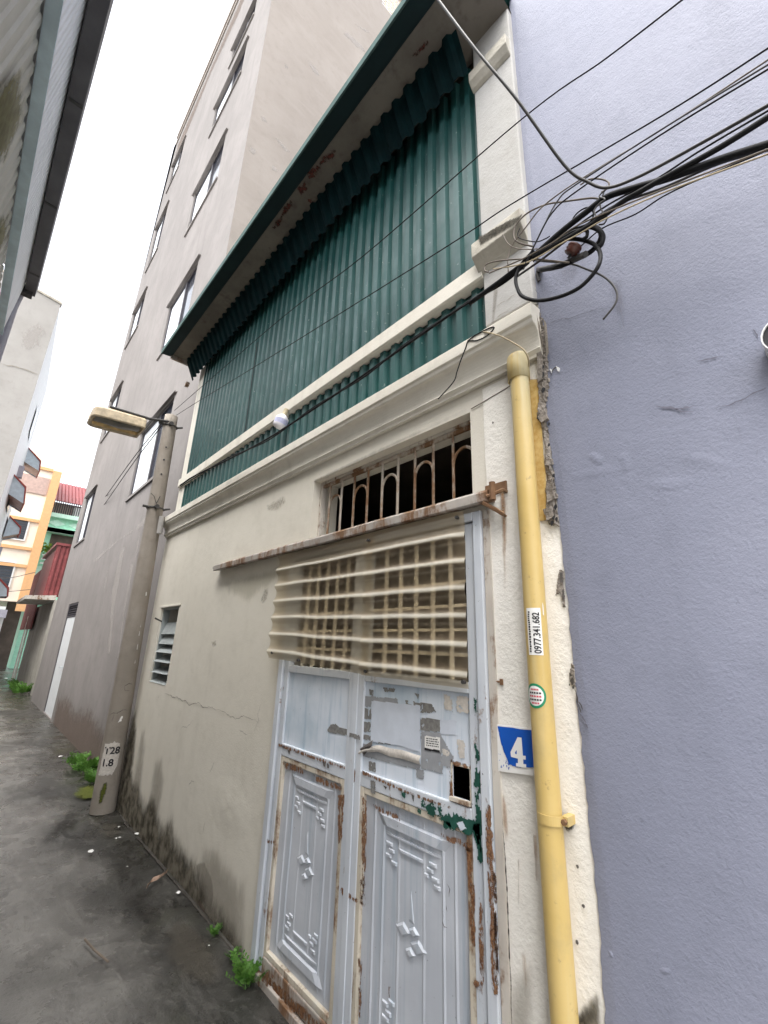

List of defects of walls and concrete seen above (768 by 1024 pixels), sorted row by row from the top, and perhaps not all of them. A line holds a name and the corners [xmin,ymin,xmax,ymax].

spalling [536,312,560,526]
water stain [54,702,103,760]
water stain [116,716,237,948]
corrosion [338,797,400,905]
corrosion [278,744,472,843]
peeling [401,743,483,864]
corrosion [441,800,506,995]